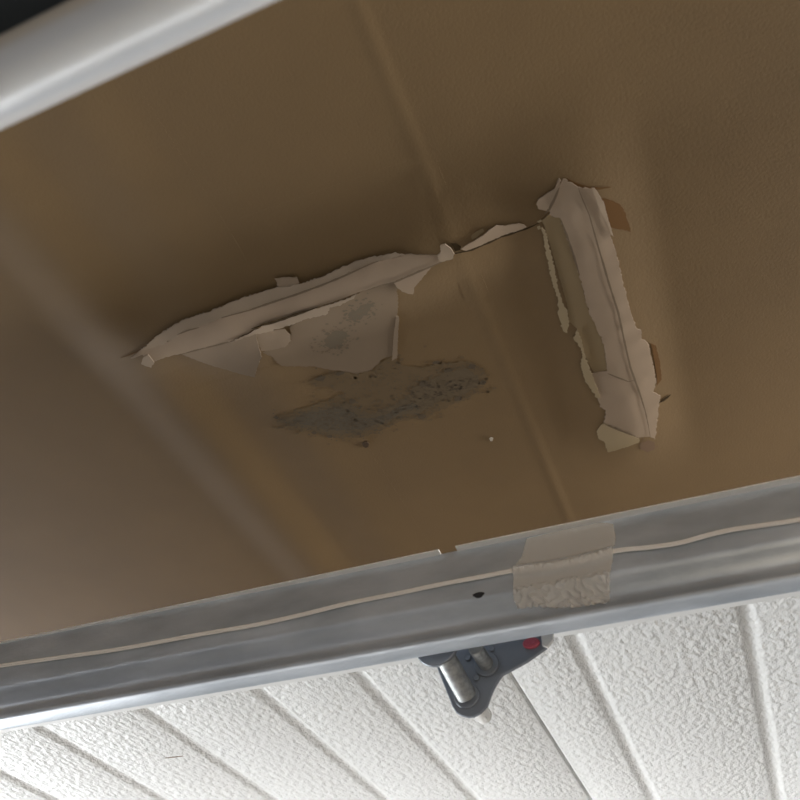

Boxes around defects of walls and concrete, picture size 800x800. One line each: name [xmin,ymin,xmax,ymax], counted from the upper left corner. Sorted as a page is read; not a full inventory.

peeling [256,268,430,374]
peeling [437,223,526,262]
crack [366,178,671,437]
peeling [536,178,607,372]
water stain [271,354,497,445]
peeling [597,423,640,452]